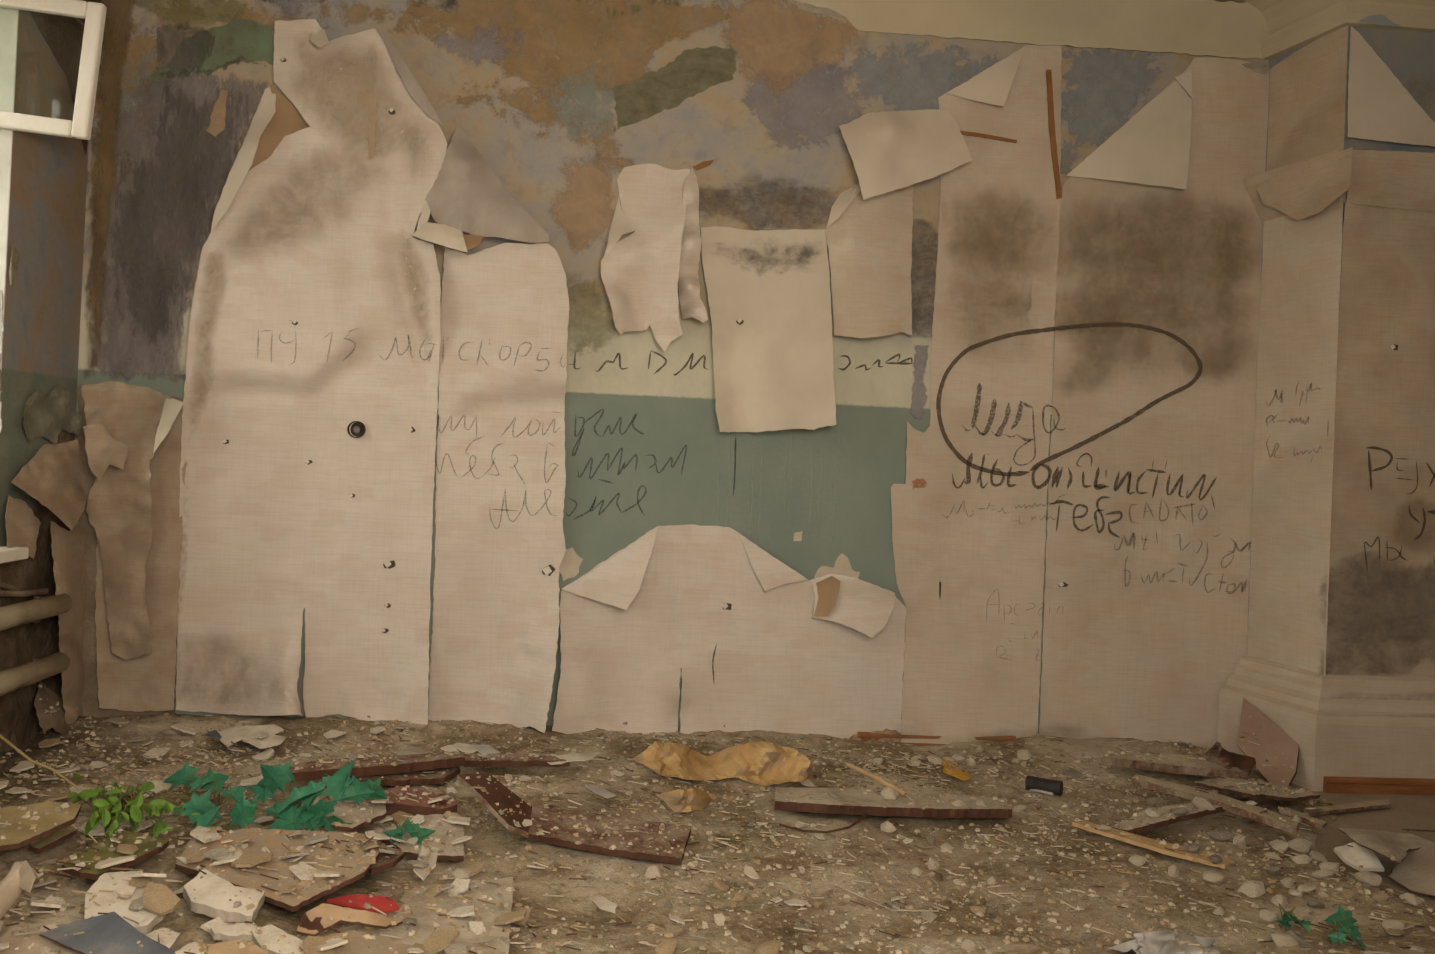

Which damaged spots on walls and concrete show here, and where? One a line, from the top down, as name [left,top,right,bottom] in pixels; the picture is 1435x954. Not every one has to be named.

flaking render [30,11,85,106]
flaking render [146,18,285,82]
flaking render [613,46,737,130]
flaking render [0,384,176,718]
flaking render [0,673,62,754]